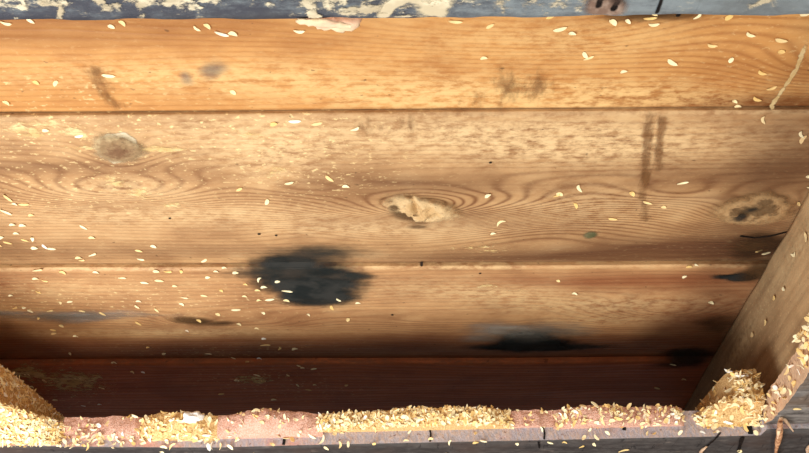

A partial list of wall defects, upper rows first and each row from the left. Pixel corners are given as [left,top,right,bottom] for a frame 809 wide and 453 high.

peeling [37,0,68,19]
peeling [92,0,218,17]
peeling [296,0,451,33]
leakage [642,119,665,182]
leakage [243,247,370,306]
leakage [471,326,602,352]